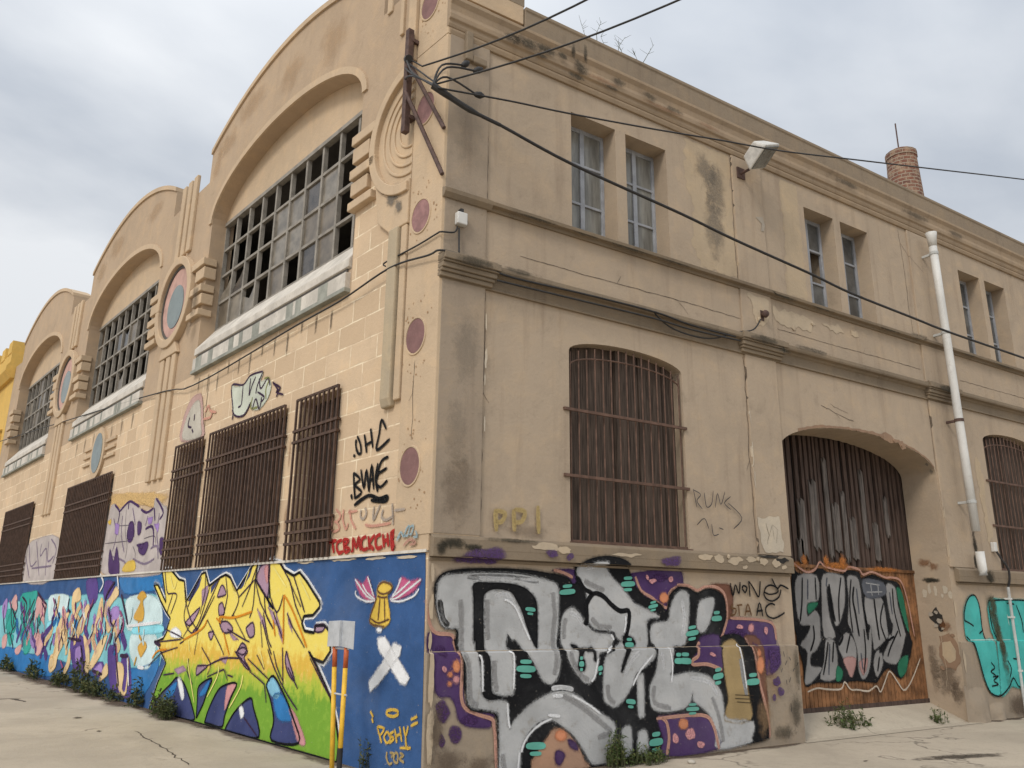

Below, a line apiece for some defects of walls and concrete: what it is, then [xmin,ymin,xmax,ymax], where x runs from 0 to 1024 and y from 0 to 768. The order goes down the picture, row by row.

leakage [507,34,587,81]
crack [521,256,737,318]
crack [743,360,778,553]
spalling [532,542,571,554]
spalling [698,554,789,570]
rust [824,556,846,569]